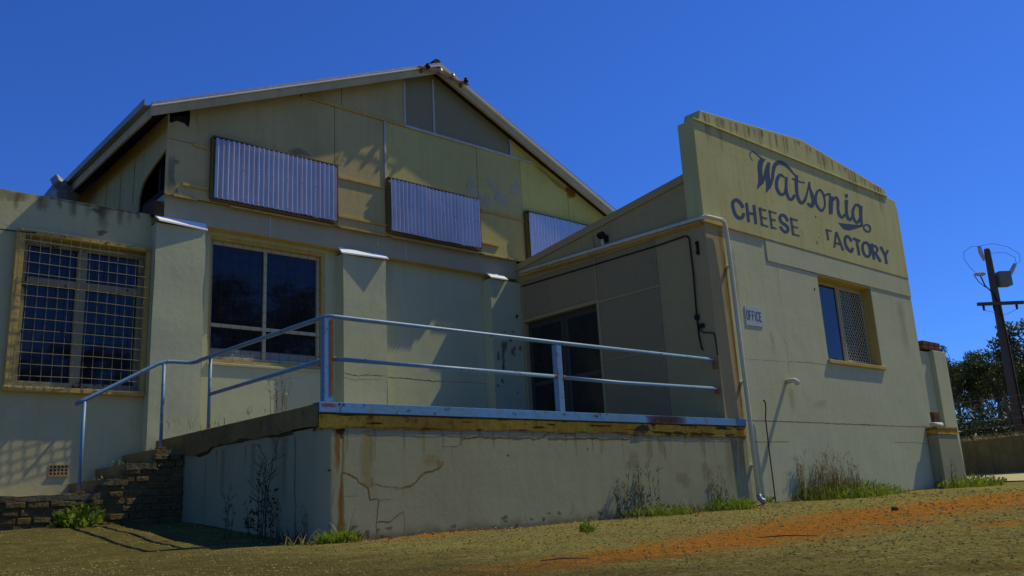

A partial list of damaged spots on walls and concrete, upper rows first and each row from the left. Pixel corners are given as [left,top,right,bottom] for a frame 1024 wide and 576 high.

spalling [633,424,743,436]
crack [339,432,629,536]